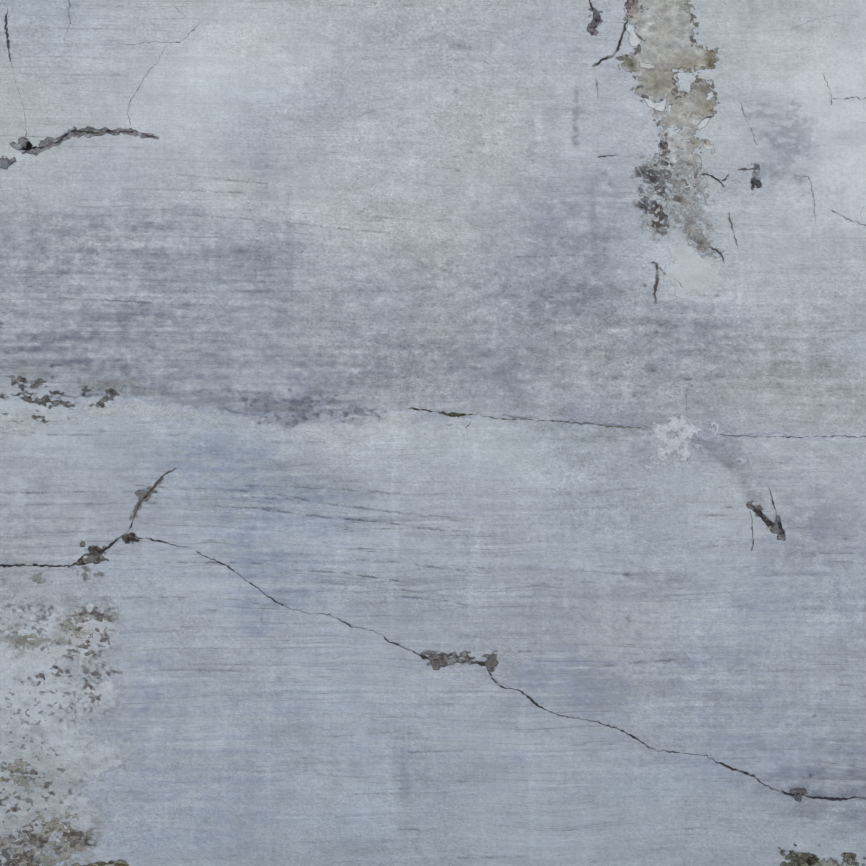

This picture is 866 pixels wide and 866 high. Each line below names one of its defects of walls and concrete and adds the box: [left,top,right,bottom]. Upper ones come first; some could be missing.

peeling [587,9,602,35]
crack [21,130,154,150]
peeling [616,0,726,299]
peeling [0,376,75,423]
crack [412,407,643,429]
crack [0,469,175,567]
spalling [747,502,785,541]
crack [384,637,568,718]
flaking render [0,542,143,866]
crack [593,721,689,754]
crack [712,758,856,801]
peeling [780,844,865,866]